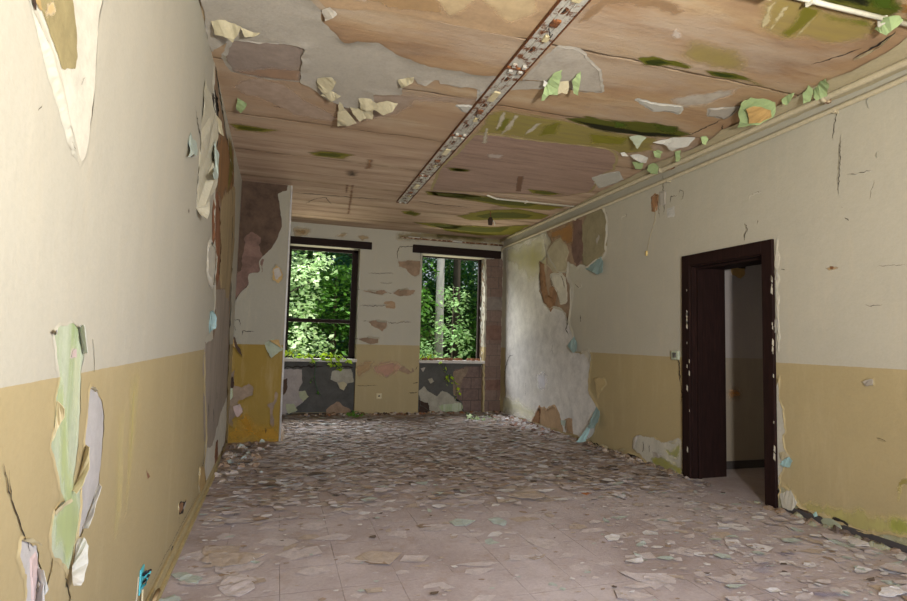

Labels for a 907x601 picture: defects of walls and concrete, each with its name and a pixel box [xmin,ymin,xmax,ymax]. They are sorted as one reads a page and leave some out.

flaking render [29,0,104,166]
peeling [875,0,907,36]
peeling [189,0,557,494]
flaking render [418,38,907,442]
flaking render [4,320,104,601]
flaking render [619,433,688,474]
spalling [773,374,907,561]